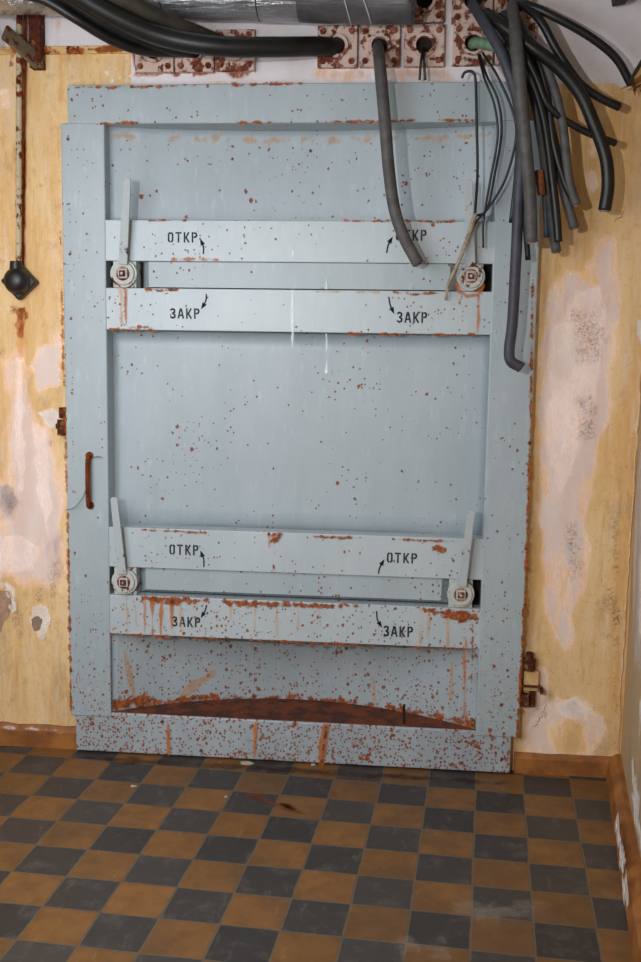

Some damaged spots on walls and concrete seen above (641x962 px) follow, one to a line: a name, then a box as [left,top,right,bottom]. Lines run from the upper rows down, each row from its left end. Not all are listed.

corrosion [15,140,26,226]
corrosion [107,266,154,332]
leakage [0,485,16,514]
corrosion [488,350,533,773]
flaking render [0,582,16,632]
flaking render [31,595,51,640]
corrosion [109,596,218,640]
corrosion [223,598,358,613]
corrosion [409,588,479,684]
corrosion [102,690,476,728]
peeling [632,758,641,848]
peeling [616,815,629,906]